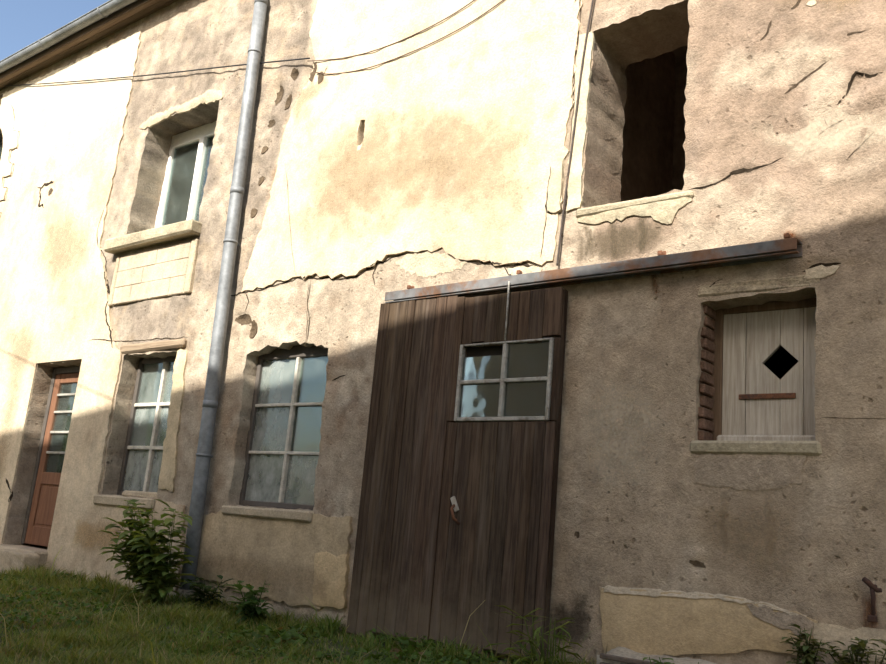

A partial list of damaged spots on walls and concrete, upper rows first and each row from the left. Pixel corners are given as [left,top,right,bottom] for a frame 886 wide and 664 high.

spalling [274,86,292,110]
spalling [309,61,327,84]
crack [568,0,582,154]
crack [815,71,883,138]
crack [689,157,783,190]
crack [231,164,407,343]
crack [467,166,552,275]
spalling [576,197,692,225]
flaking render [599,585,886,663]